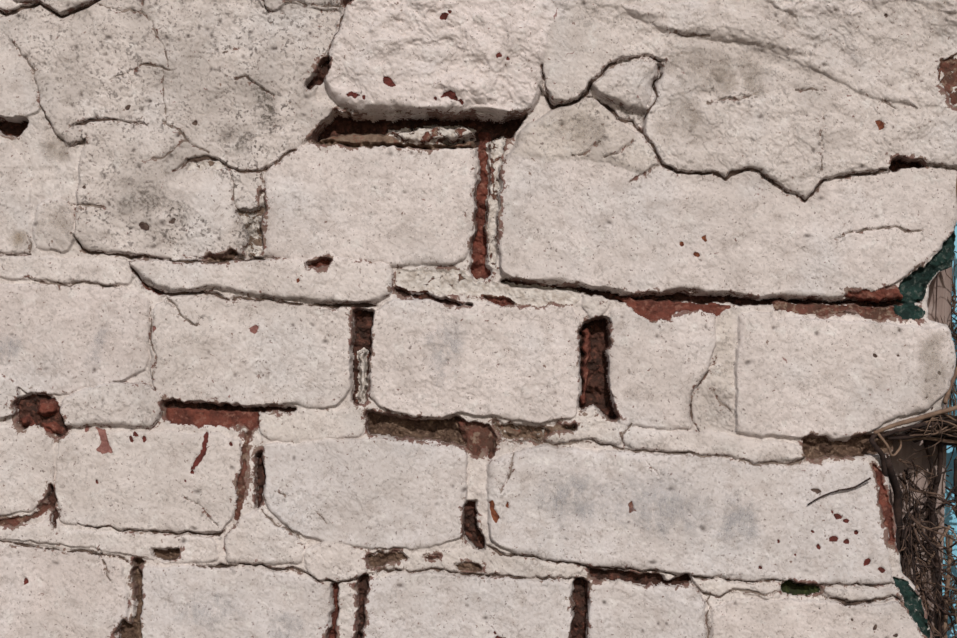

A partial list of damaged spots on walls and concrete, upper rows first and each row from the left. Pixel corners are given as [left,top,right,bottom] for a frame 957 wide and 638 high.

spalling [937,52,957,108]
crack [542,56,887,202]
crack [0,0,375,379]
crack [927,162,956,170]
crack [840,226,923,238]
spalling [615,296,731,322]
peeling [85,426,113,454]
peeling [184,432,209,482]
spalling [457,418,498,459]
crack [500,359,805,494]
spalling [872,464,897,551]